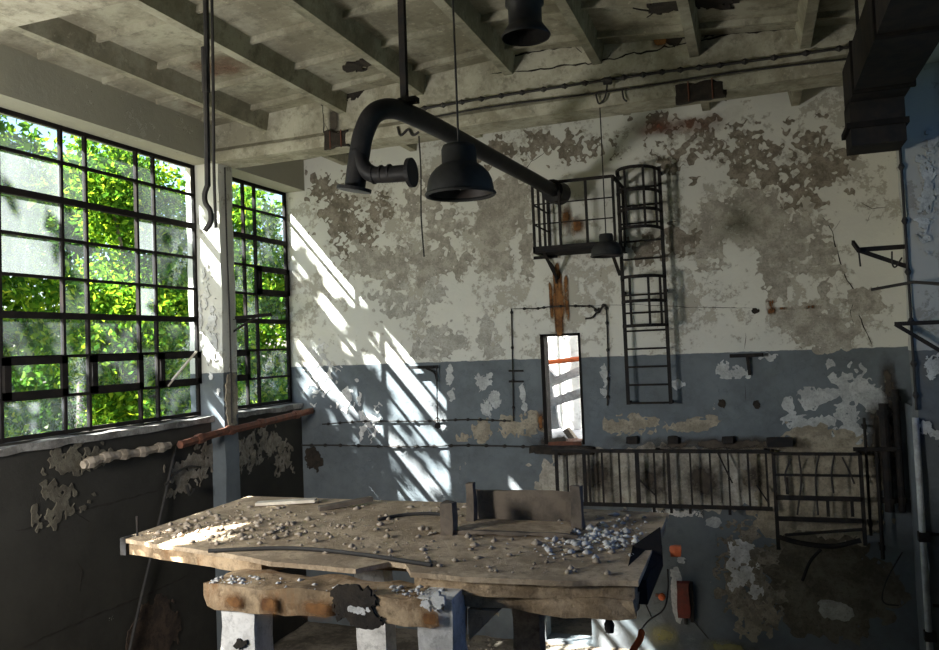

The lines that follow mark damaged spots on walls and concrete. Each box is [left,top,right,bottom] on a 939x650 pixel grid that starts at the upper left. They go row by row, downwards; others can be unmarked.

spalling [647,1,678,15]
spalling [324,129,350,150]
peeling [488,127,619,168]
peeling [304,159,535,402]
rust [549,263,569,336]
peeling [303,339,383,444]
peeling [455,372,544,444]
peeling [30,441,114,533]
peeling [163,441,213,499]
peeling [239,425,323,478]
spalling [330,584,384,630]
peeling [420,590,446,612]